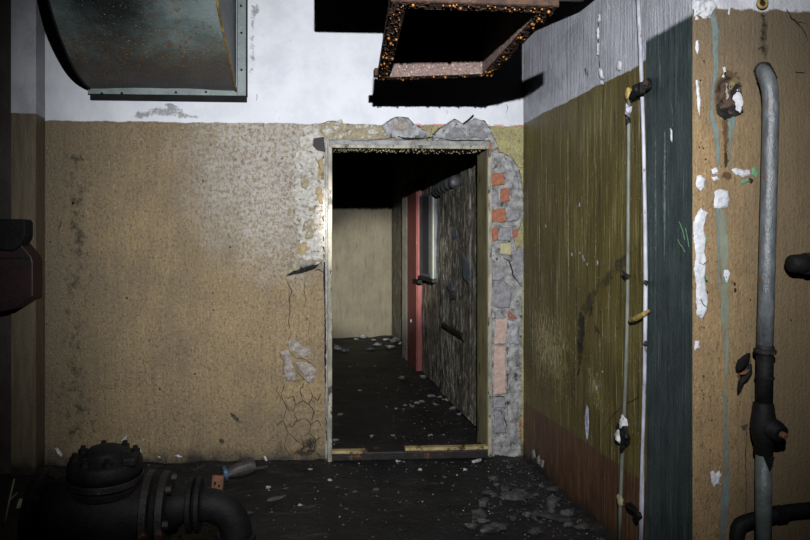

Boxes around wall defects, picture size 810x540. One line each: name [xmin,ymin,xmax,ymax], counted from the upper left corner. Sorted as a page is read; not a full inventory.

peeling [693,167,759,328]
crack [280,279,314,345]
flaking render [291,117,524,457]
peeling [279,339,317,385]
crack [274,384,321,456]